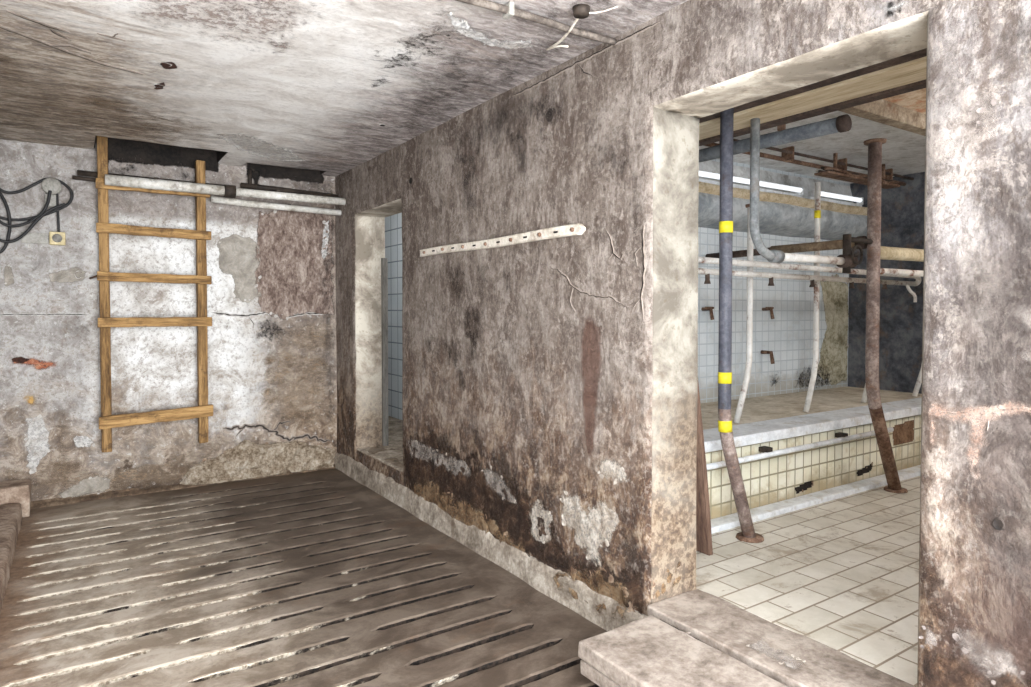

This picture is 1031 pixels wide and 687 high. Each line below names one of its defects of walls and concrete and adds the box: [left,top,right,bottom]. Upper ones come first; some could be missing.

water stain [141,0,306,48]
spalling [217,210,334,320]
rust [12,357,56,370]
crack [223,421,332,443]
crack [935,406,1031,431]
water stain [403,430,644,615]
water stain [923,569,1031,687]